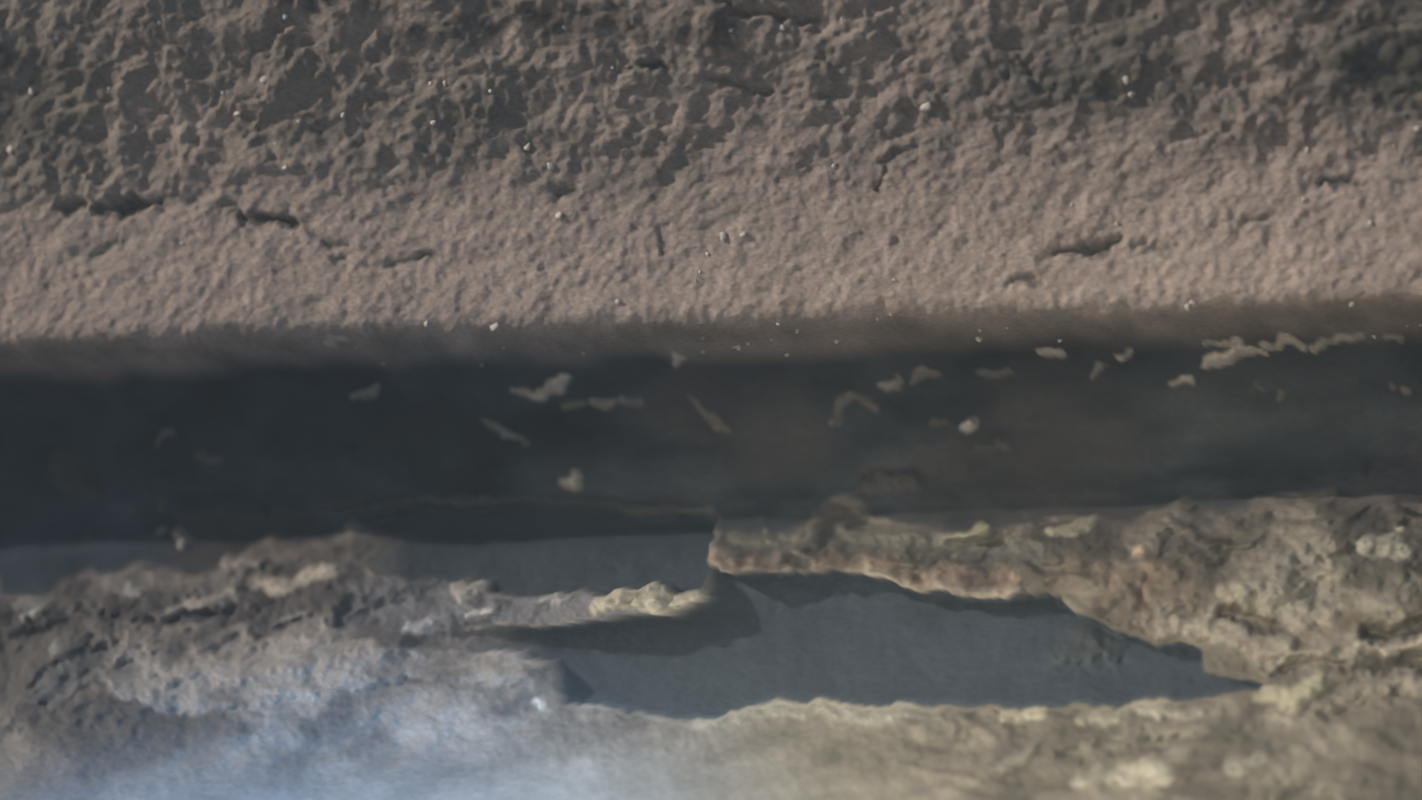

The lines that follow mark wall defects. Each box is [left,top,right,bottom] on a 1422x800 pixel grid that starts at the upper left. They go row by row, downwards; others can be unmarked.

spalling [0,495,1422,800]
crack [1274,616,1422,678]